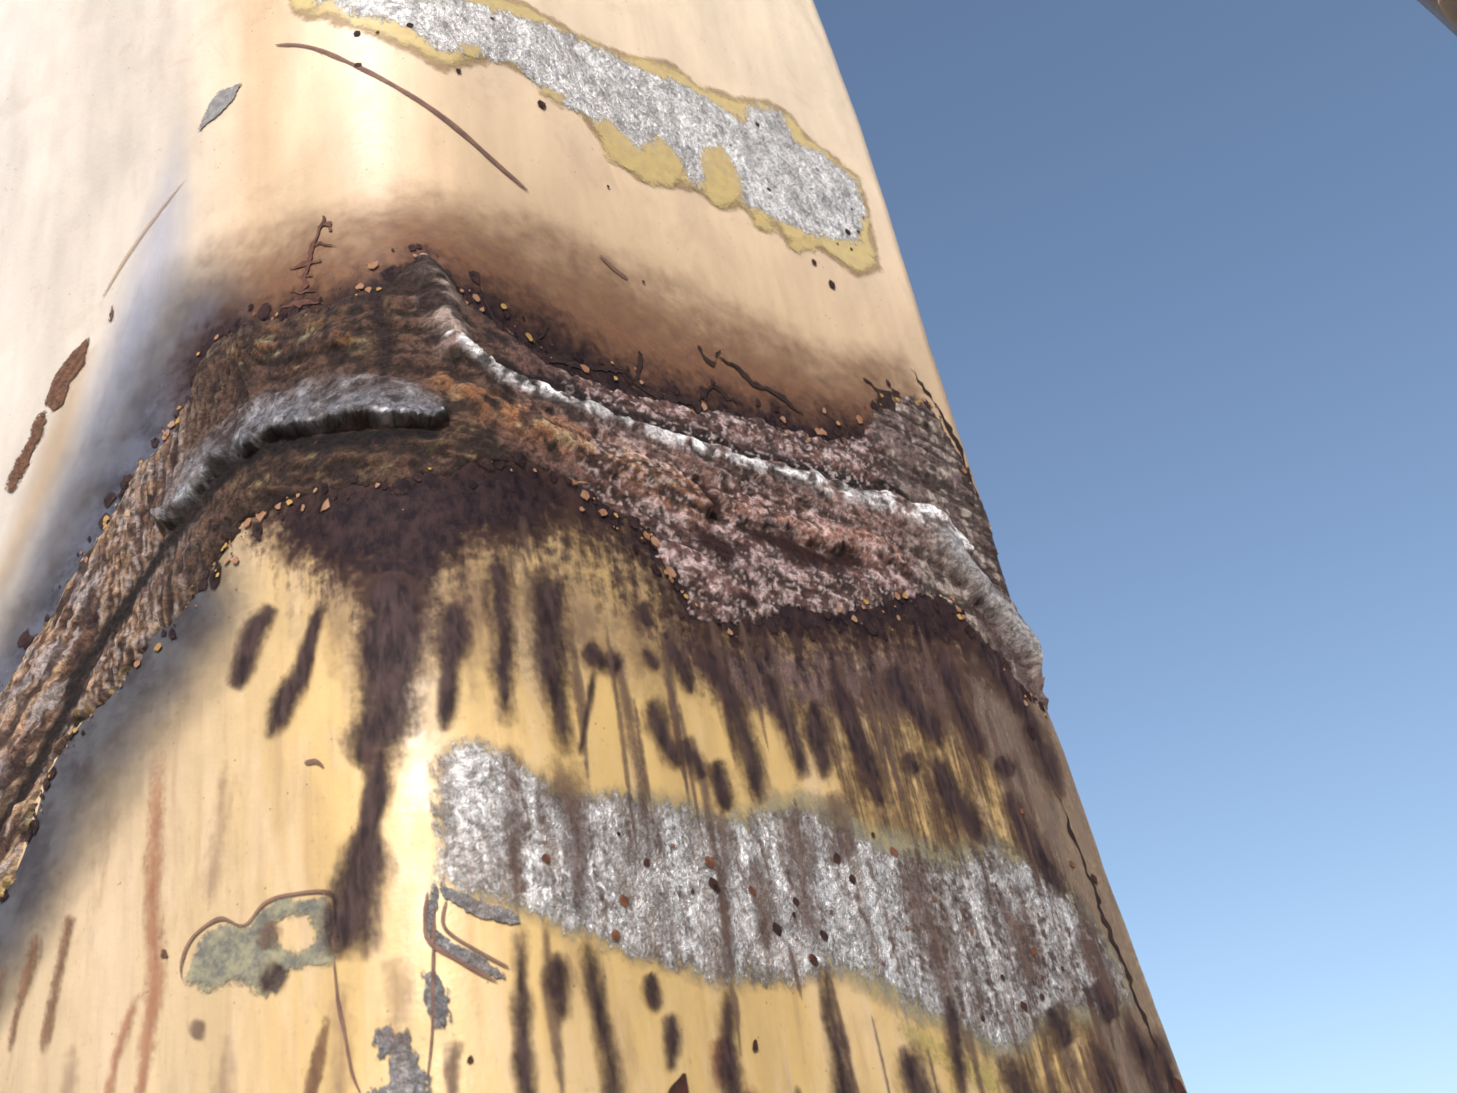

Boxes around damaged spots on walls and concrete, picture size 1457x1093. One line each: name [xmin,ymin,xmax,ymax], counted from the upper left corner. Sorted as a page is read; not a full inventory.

peeling [291,0,878,271]
damp [0,213,946,692]
corrosion [106,796,162,1093]
damp [0,451,1065,1093]
peeling [160,741,1131,1093]
crack [1055,792,1156,1044]